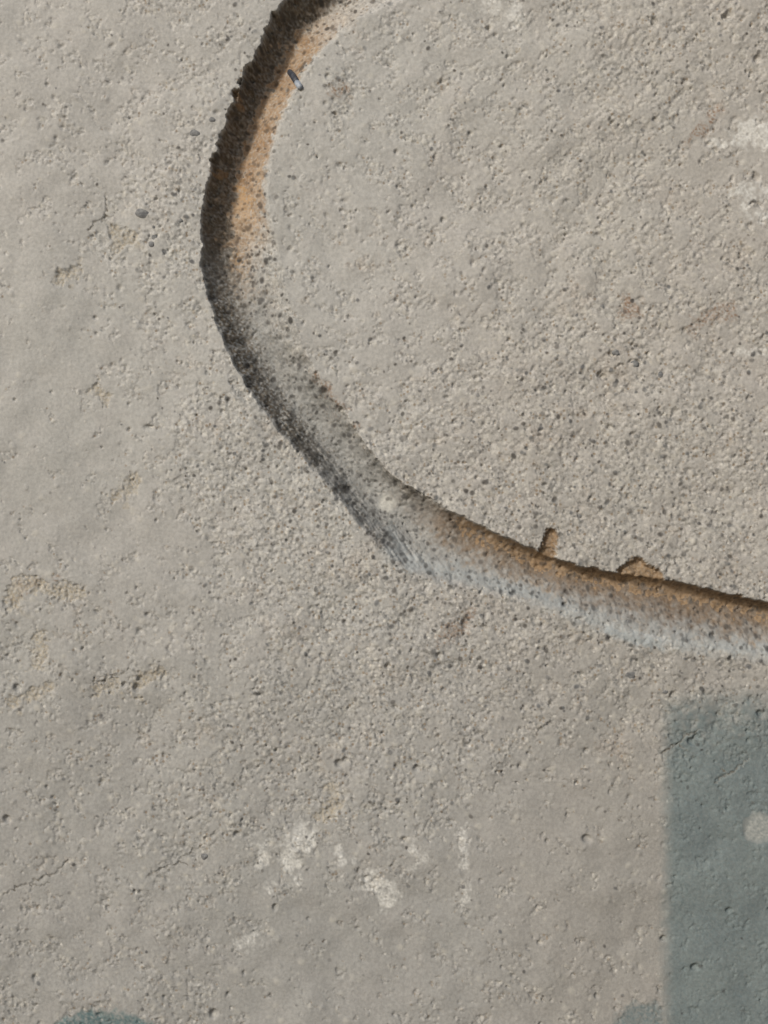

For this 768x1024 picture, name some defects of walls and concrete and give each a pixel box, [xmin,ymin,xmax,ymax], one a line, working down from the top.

spalling [232,88,246,114]
rust [227,0,384,307]
spalling [530,527,560,574]
rust [369,463,768,650]
spalling [613,556,665,586]